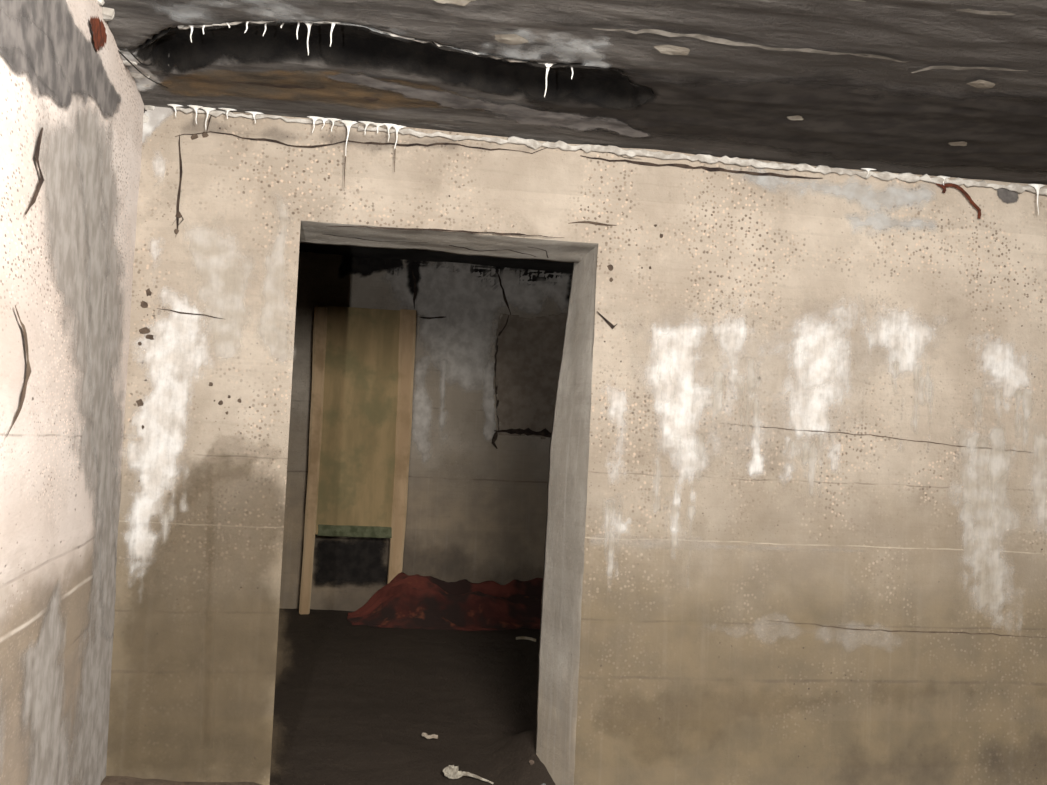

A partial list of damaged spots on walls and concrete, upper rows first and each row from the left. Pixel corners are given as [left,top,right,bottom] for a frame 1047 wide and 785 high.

crack [172,115,548,237]
spalling [137,20,656,109]
leakage [376,29,557,64]
leakage [142,42,1047,205]
crack [6,305,31,438]
leakage [0,0,250,785]
leakage [339,255,572,459]
crack [325,221,617,449]
leakage [647,319,763,547]
leakage [786,307,931,494]
leakage [982,344,1047,522]
leakage [313,524,392,586]